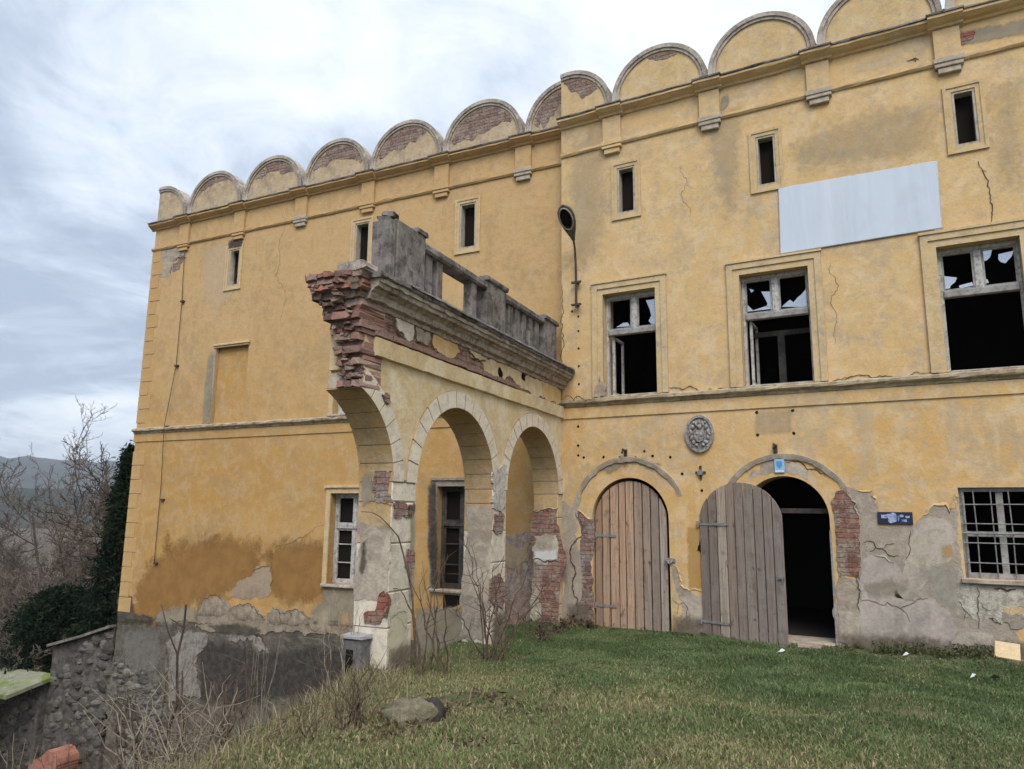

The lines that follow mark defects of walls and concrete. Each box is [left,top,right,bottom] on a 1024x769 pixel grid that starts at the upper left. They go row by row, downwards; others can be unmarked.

crack [978,161,993,222]
flaking render [156,247,187,278]
flaking render [372,471,416,519]
flaking render [459,465,596,641]
crack [865,533,911,559]
flaking render [831,487,1024,649]
leakage [117,535,333,672]
crack [856,578,928,622]
flaking render [102,565,391,769]